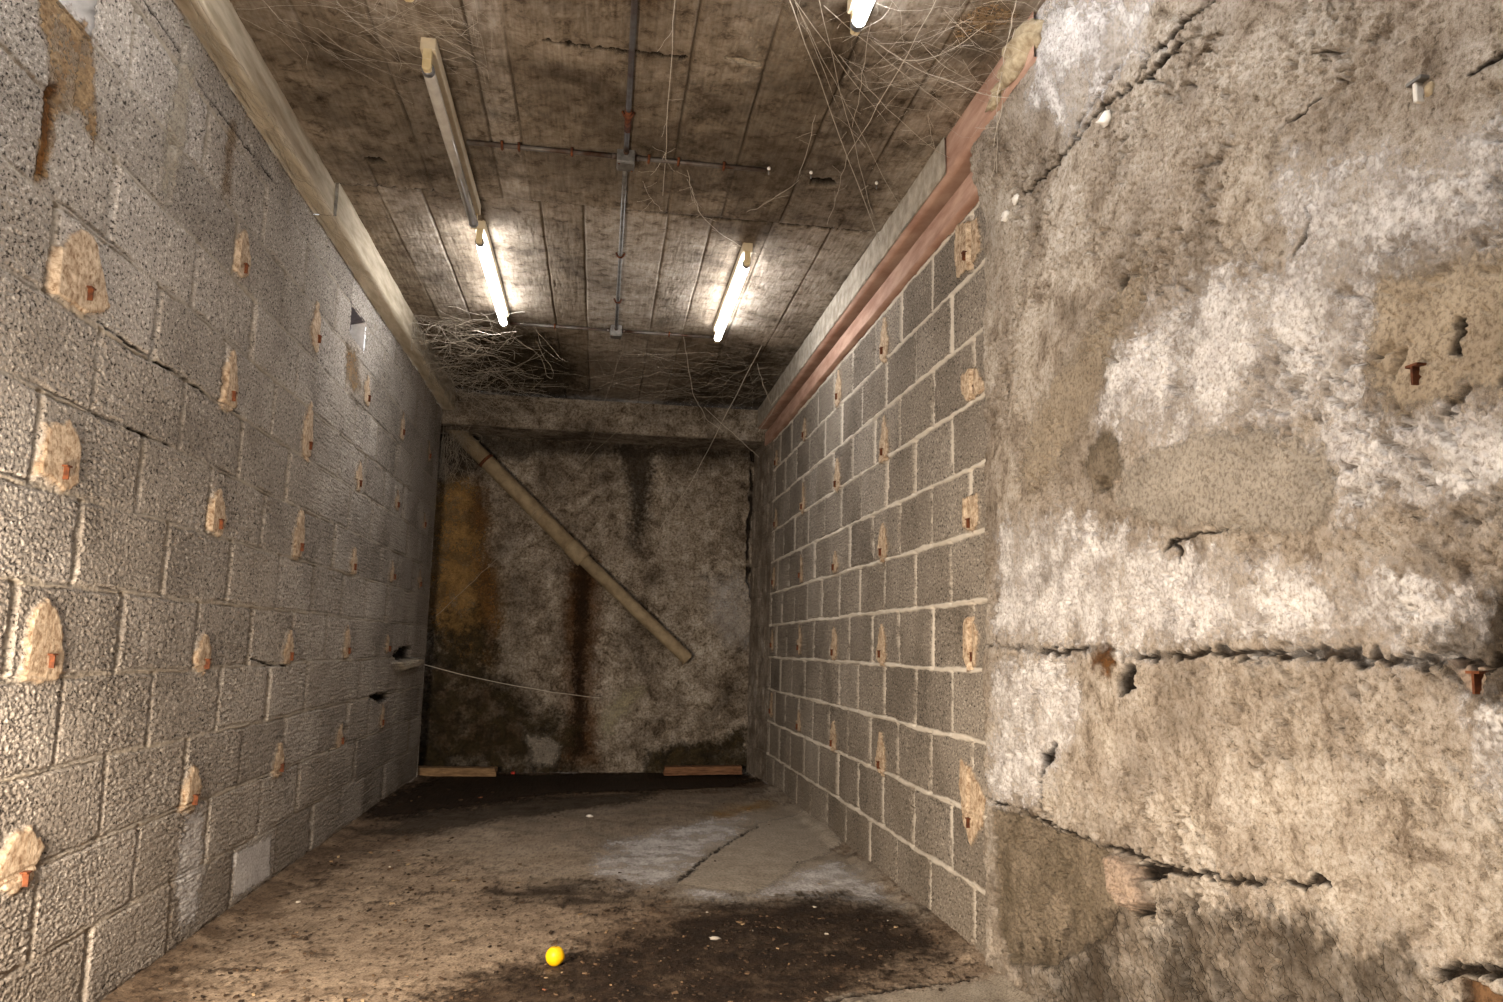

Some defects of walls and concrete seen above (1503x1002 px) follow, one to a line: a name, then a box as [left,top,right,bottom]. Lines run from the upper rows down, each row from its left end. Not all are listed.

corrosion [34,0,98,182]
crack [1024,9,1204,194]
spalling [1456,319,1468,355]
crack [1166,528,1229,562]
crack [1017,645,1089,657]
crack [1132,644,1503,689]
water stain [361,609,761,835]
water stain [487,807,760,906]
water stain [431,862,943,1002]
water stain [1053,912,1134,1002]
water stain [1150,906,1413,1002]
spalling [1445,964,1503,1002]